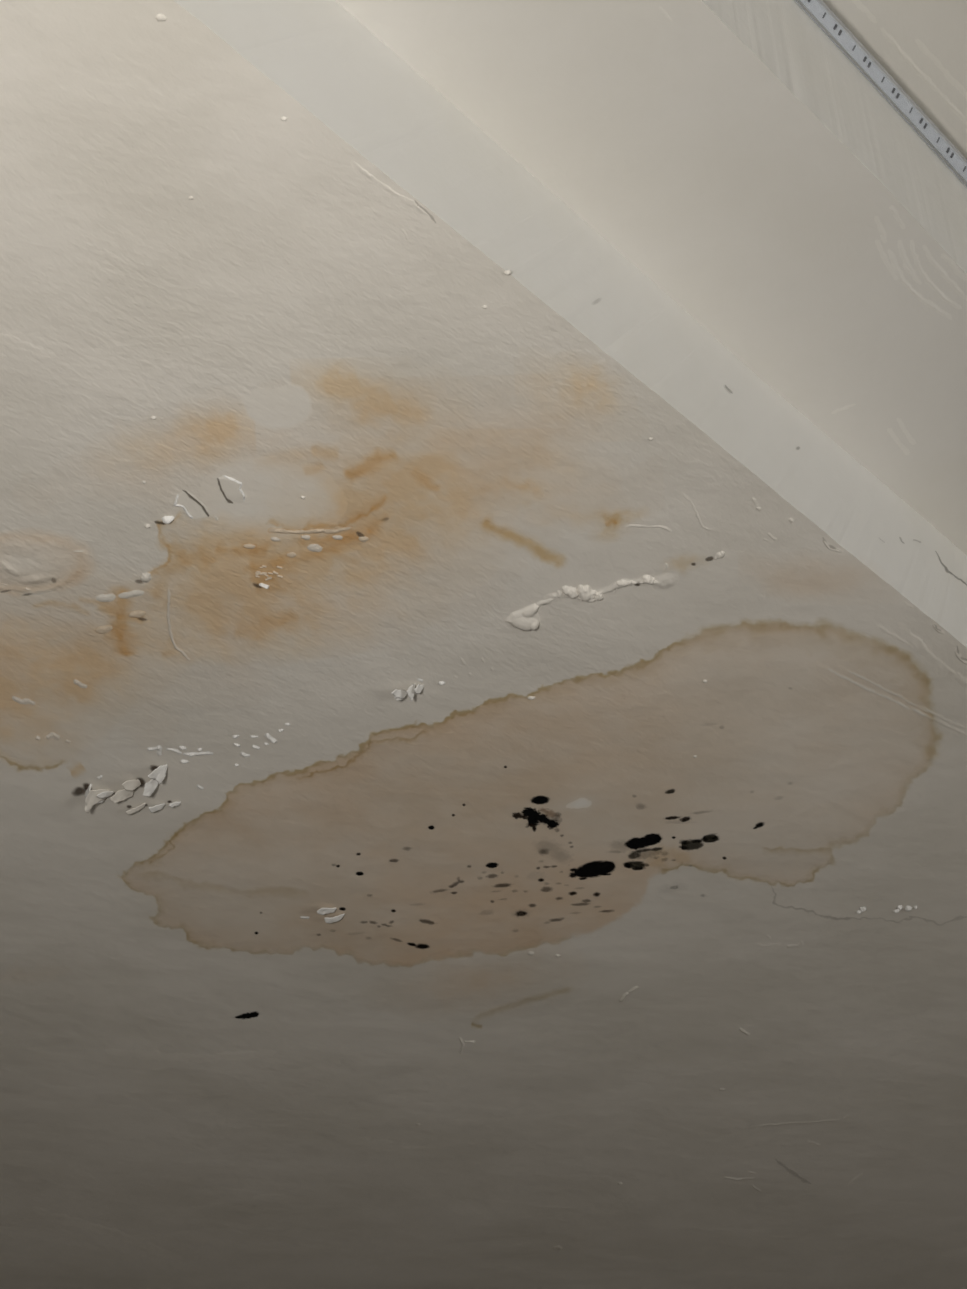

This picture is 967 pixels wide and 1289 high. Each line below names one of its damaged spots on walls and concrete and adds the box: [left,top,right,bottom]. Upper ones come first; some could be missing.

peeling [391,657,494,701]
peeling [74,764,181,815]
mould [513,796,559,831]
mould [570,834,718,895]